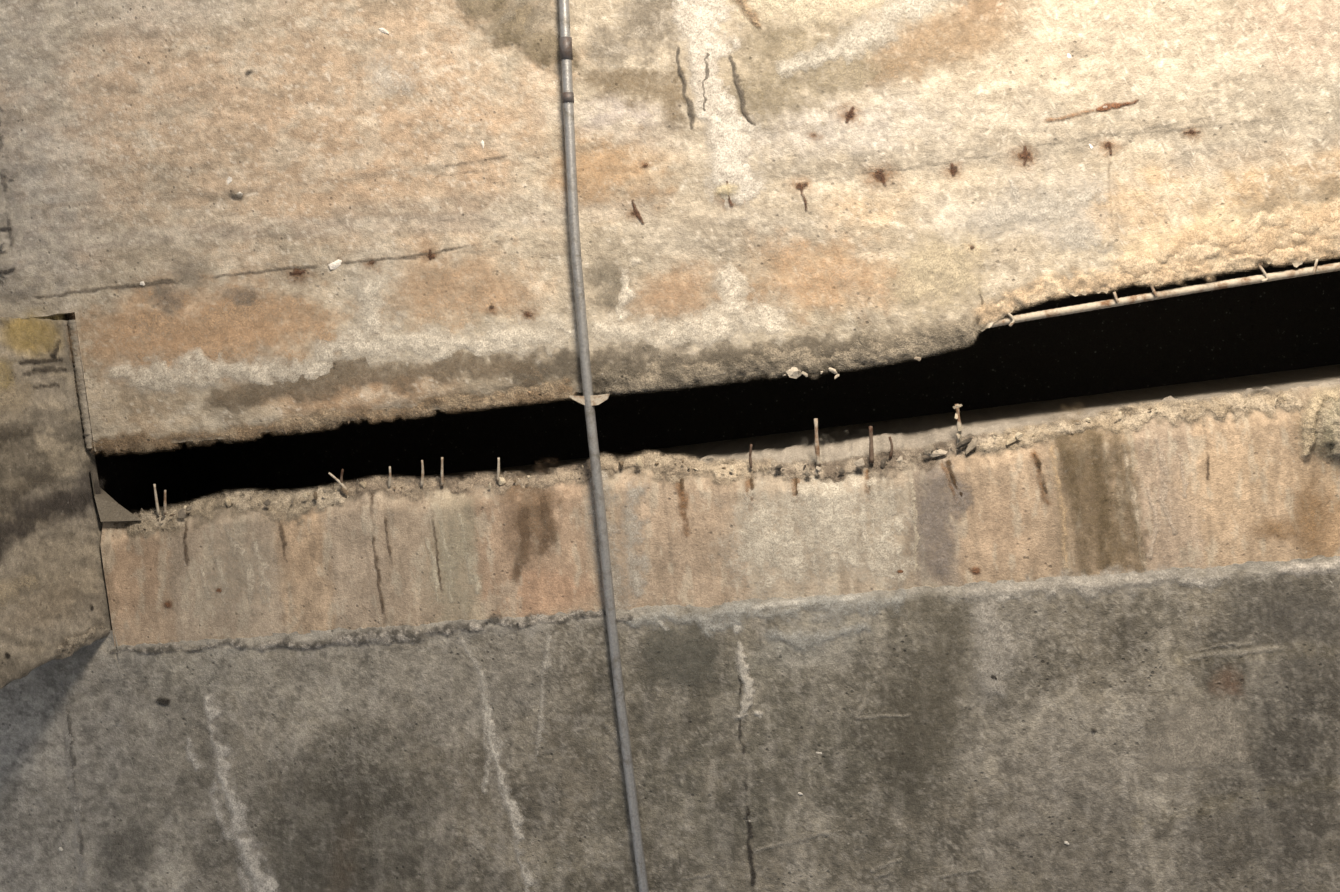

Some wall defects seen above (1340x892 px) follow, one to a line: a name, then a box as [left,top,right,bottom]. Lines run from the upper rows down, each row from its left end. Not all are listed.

crack [676,47,755,128]
damp [735,0,996,117]
rust [873,169,889,184]
rust [1019,146,1033,165]
rust [1047,99,1138,121]
crack [214,247,459,278]
spalling [592,199,1340,395]
spalling [92,378,575,453]
spalling [127,390,1304,537]
damp [589,469,972,719]
damp [461,638,534,892]
crack [738,675,756,885]